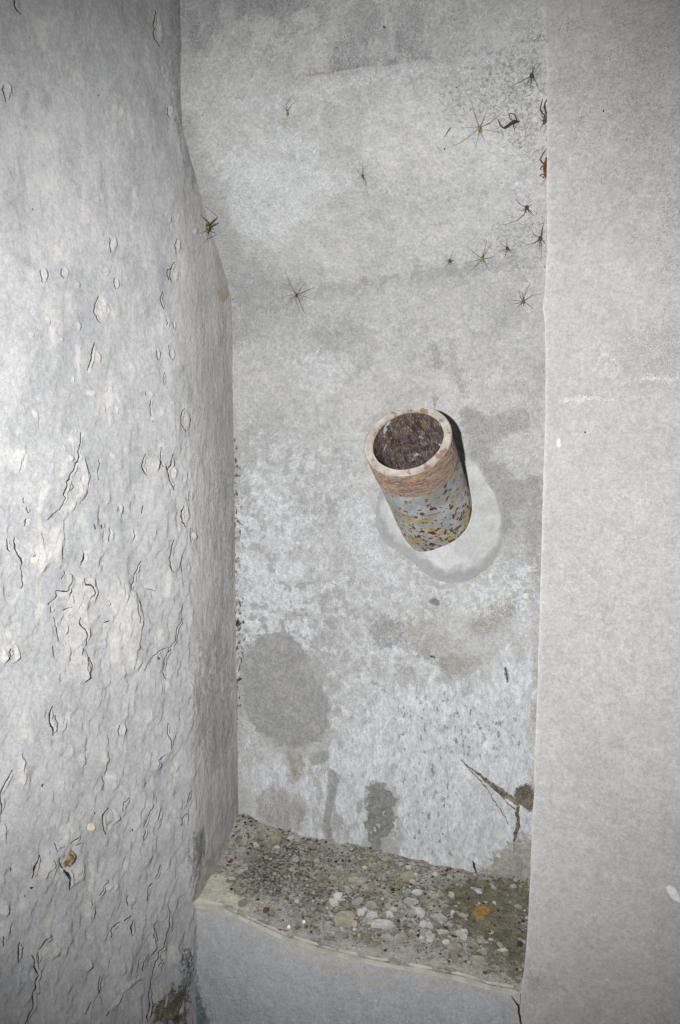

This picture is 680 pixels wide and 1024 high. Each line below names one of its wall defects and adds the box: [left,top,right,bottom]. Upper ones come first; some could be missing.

crack [160,261,179,309]
crack [87,343,101,373]
crack [160,447,193,501]
crack [6,431,84,592]
crack [84,577,98,601]
damp [189,338,543,875]
crack [144,618,182,680]
crack [48,706,68,736]
crack [0,752,28,814]
crack [143,792,191,840]
crack [29,837,172,1022]
crack [2,935,52,1024]